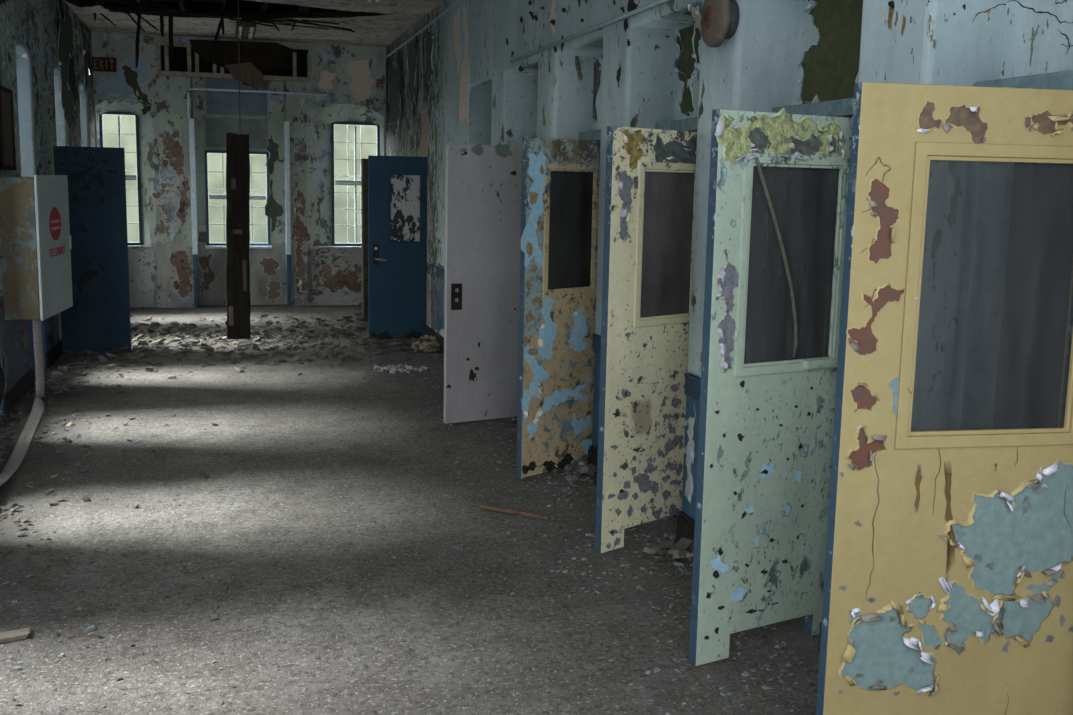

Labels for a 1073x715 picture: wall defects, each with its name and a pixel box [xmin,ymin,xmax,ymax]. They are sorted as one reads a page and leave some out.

peeling [57,0,336,130]
peeling [715,0,863,165]
peeling [917,99,988,144]
peeling [1025,109,1073,137]
peeling [136,130,216,302]
peeling [265,136,362,293]
peeling [867,178,900,265]
peeling [511,152,598,460]
peeling [846,283,918,356]
peeling [839,425,887,477]
peeling [849,376,913,417]
peeling [838,458,1073,696]